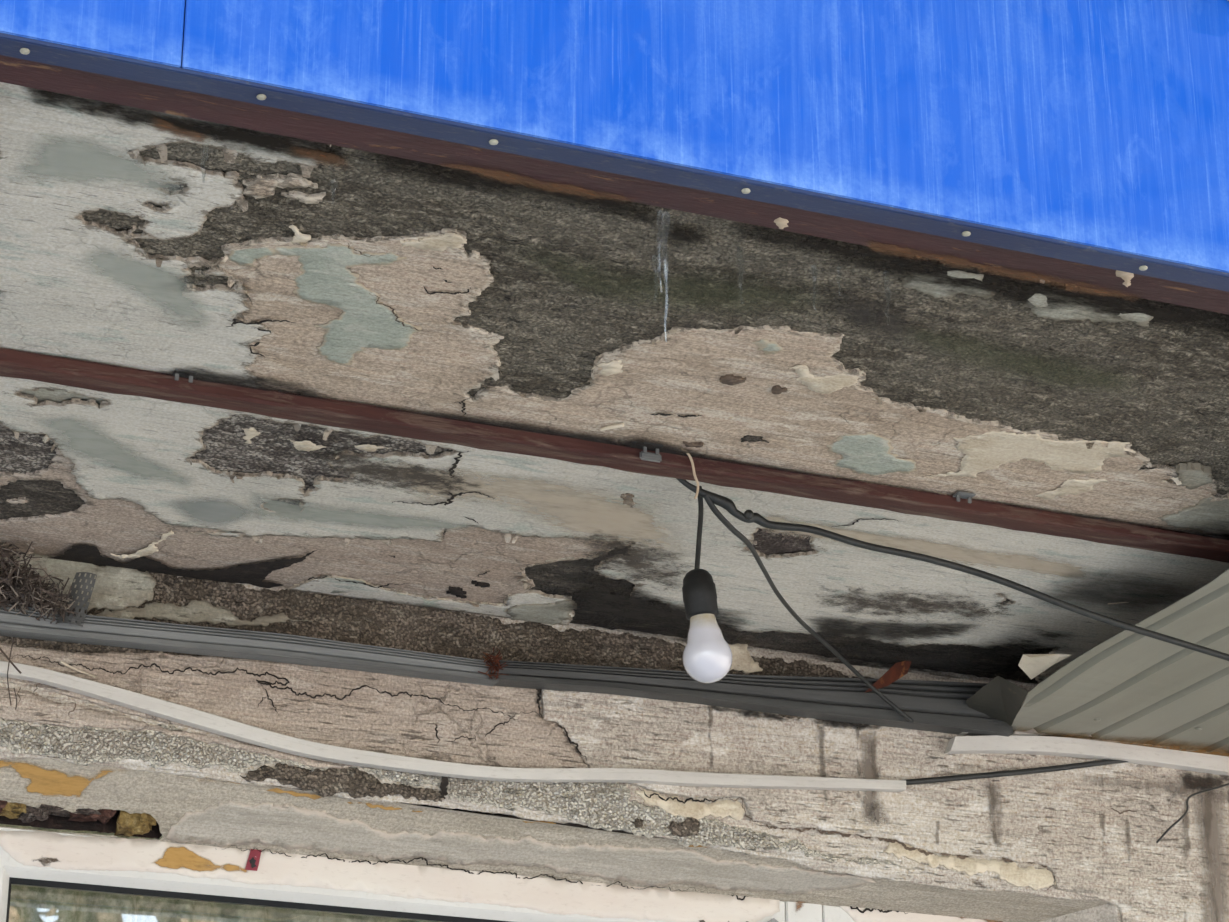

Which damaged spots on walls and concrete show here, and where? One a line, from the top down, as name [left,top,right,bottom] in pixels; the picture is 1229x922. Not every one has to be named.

corrosion [155,119,207,142]
corrosion [443,164,628,199]
corrosion [869,241,1133,298]
spalling [82,142,1229,533]
damp [161,368,323,399]
peeling [0,423,687,671]
damp [569,582,690,641]
spalling [723,628,1038,684]
damp [814,619,975,641]
crack [1,653,587,761]
crack [440,776,449,799]
spalling [0,718,1056,890]